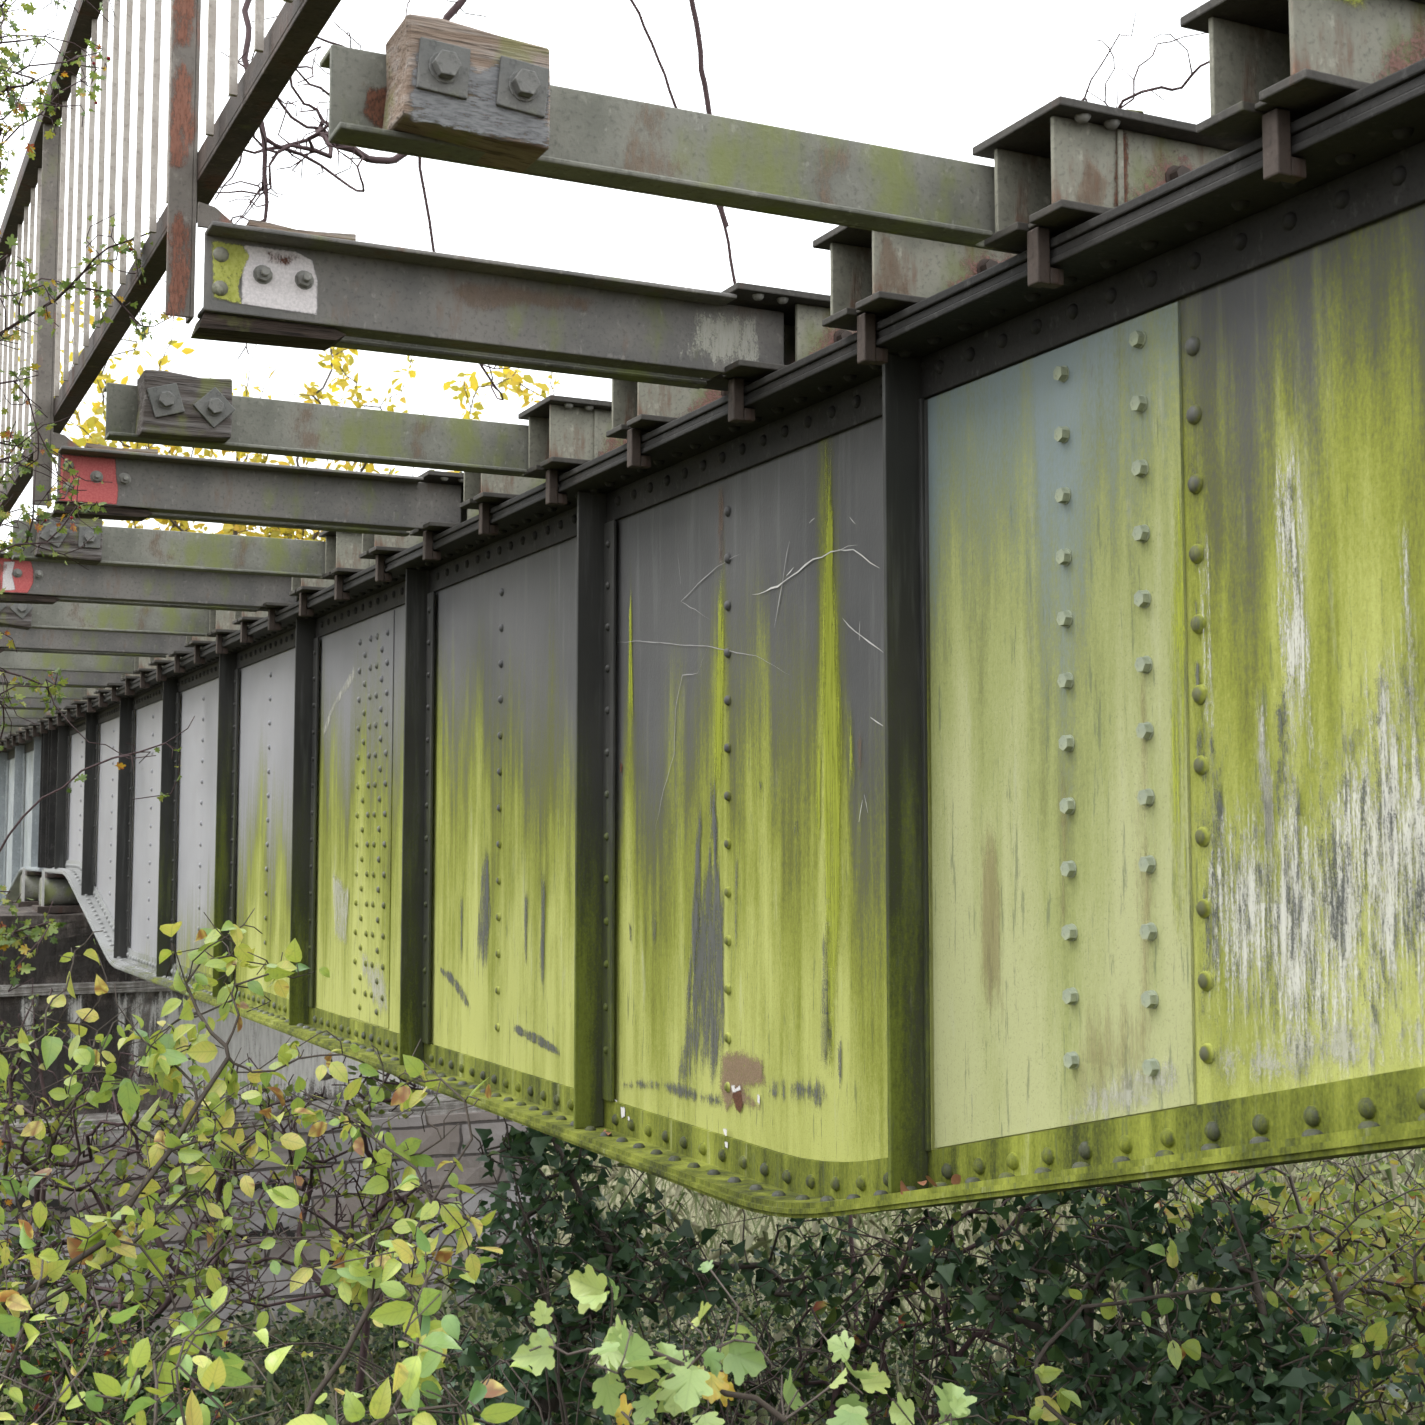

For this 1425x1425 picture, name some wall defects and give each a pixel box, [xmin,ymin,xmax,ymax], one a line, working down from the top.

leakage [1276,685,1289,813]
leakage [1196,731,1224,993]
leakage [1325,774,1370,961]